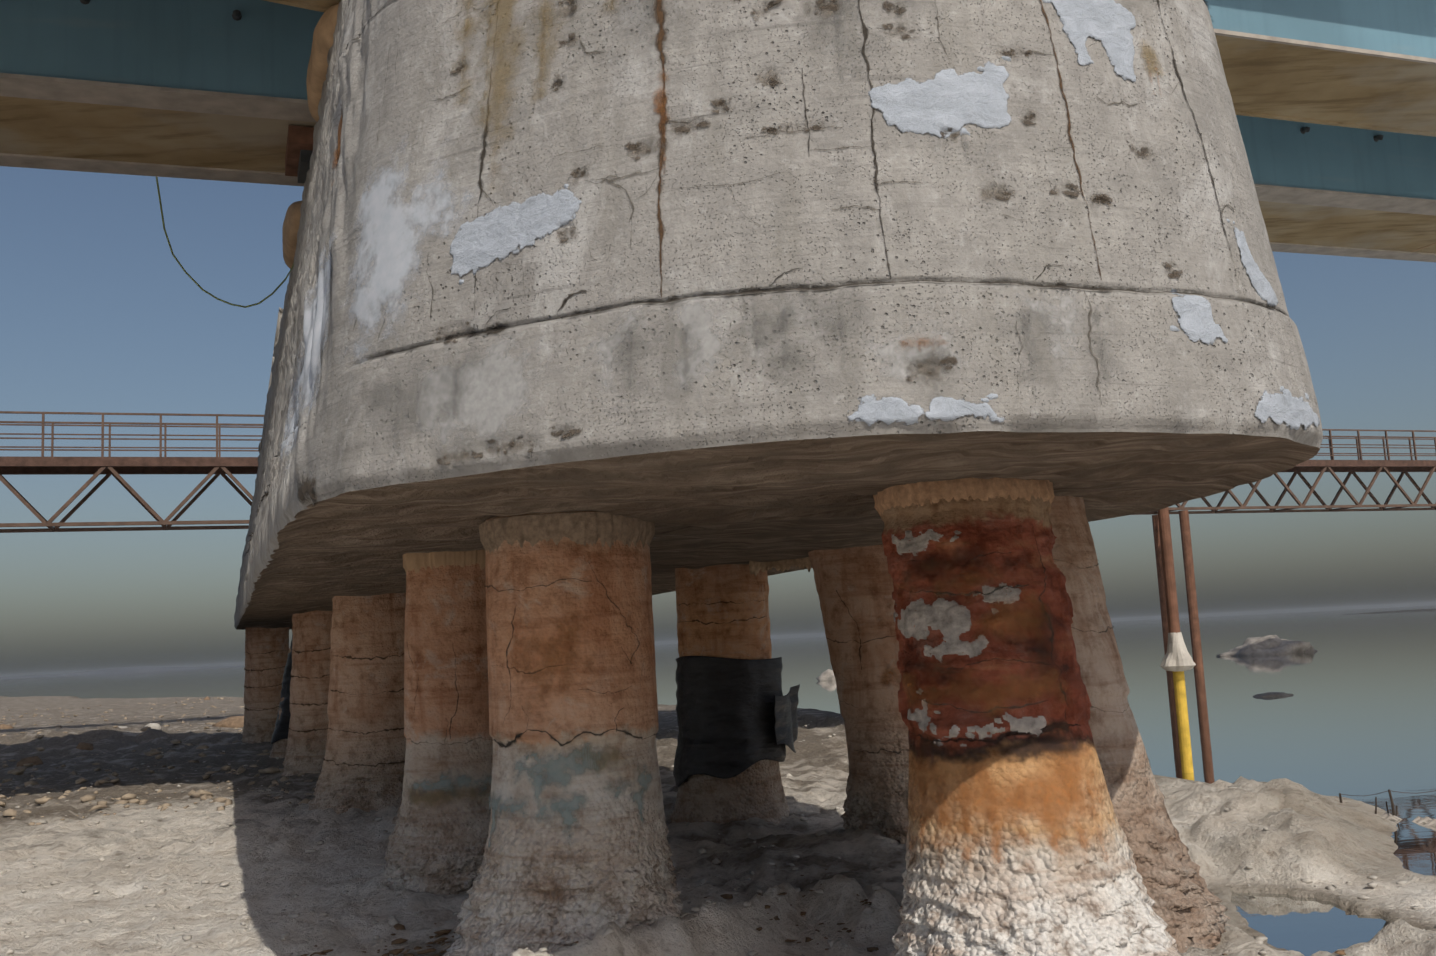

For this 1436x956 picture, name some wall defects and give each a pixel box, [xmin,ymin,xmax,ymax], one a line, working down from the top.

peeling [1043,0,1136,82]
rust [654,74,666,130]
peeling [868,49,1036,139]
crack [353,0,1285,403]
peeling [351,168,585,328]
peeling [1163,262,1228,345]
peeling [848,393,1005,426]
spalling [907,356,957,381]
peeling [1255,386,1320,430]